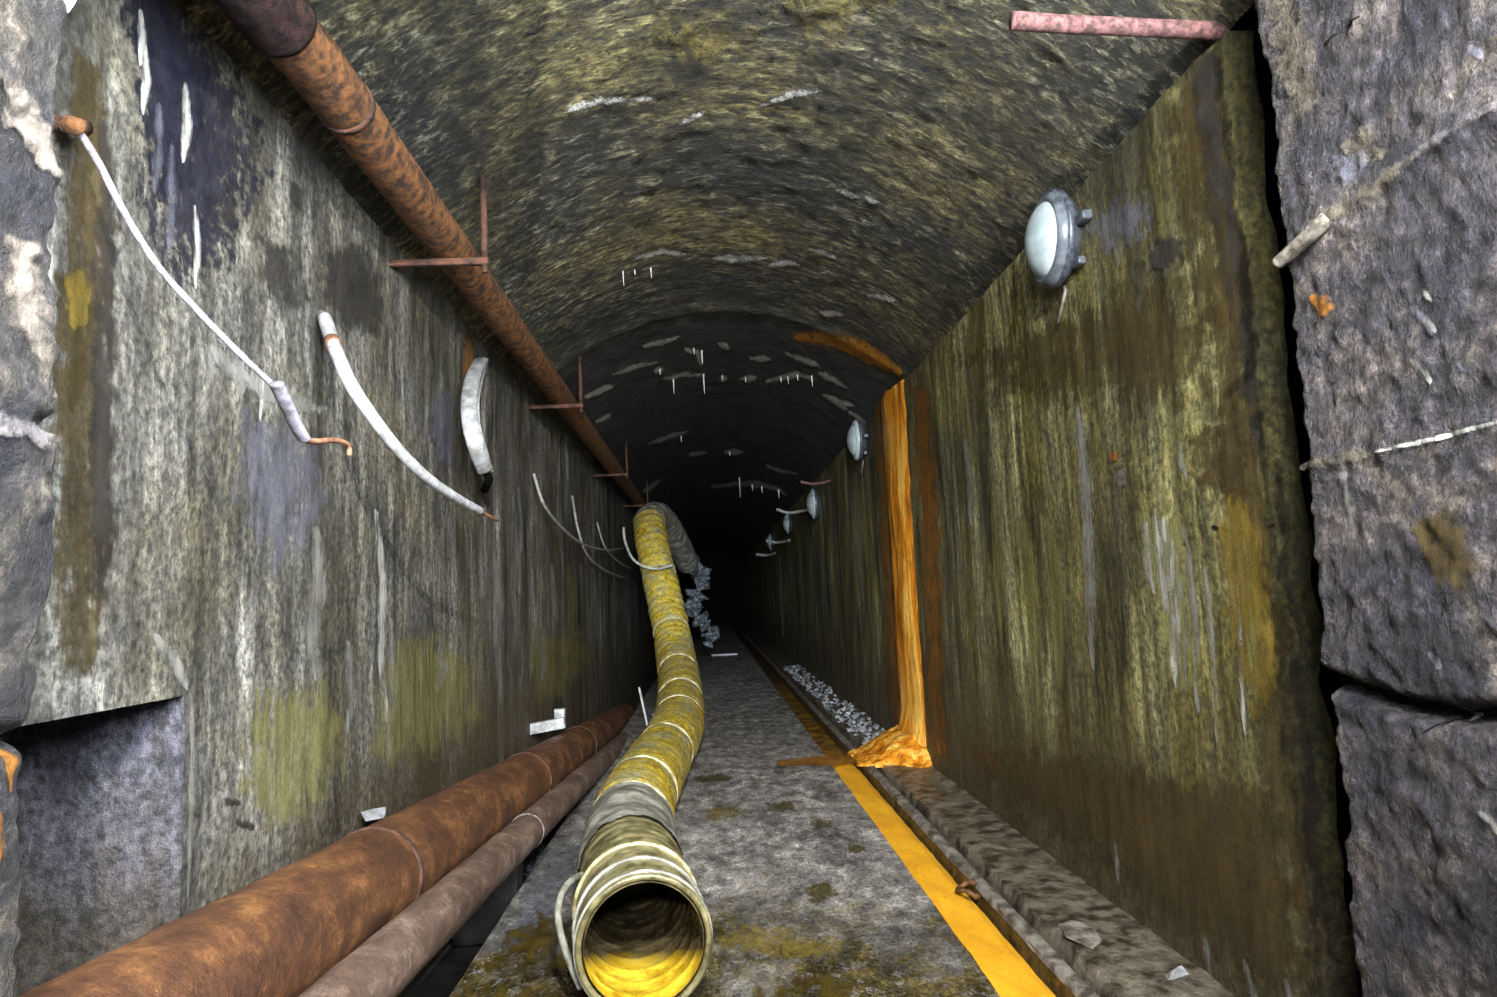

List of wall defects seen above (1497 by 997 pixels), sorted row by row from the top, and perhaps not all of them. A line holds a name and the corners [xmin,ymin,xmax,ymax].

water stain [1410,359,1432,384]
water stain [1412,290,1436,335]
water stain [240,526,354,825]
water stain [374,509,480,764]
water stain [492,487,523,647]
rust [776,331,946,768]
water stain [961,53,1336,997]
water stain [1300,423,1491,528]
crack [1339,674,1497,733]